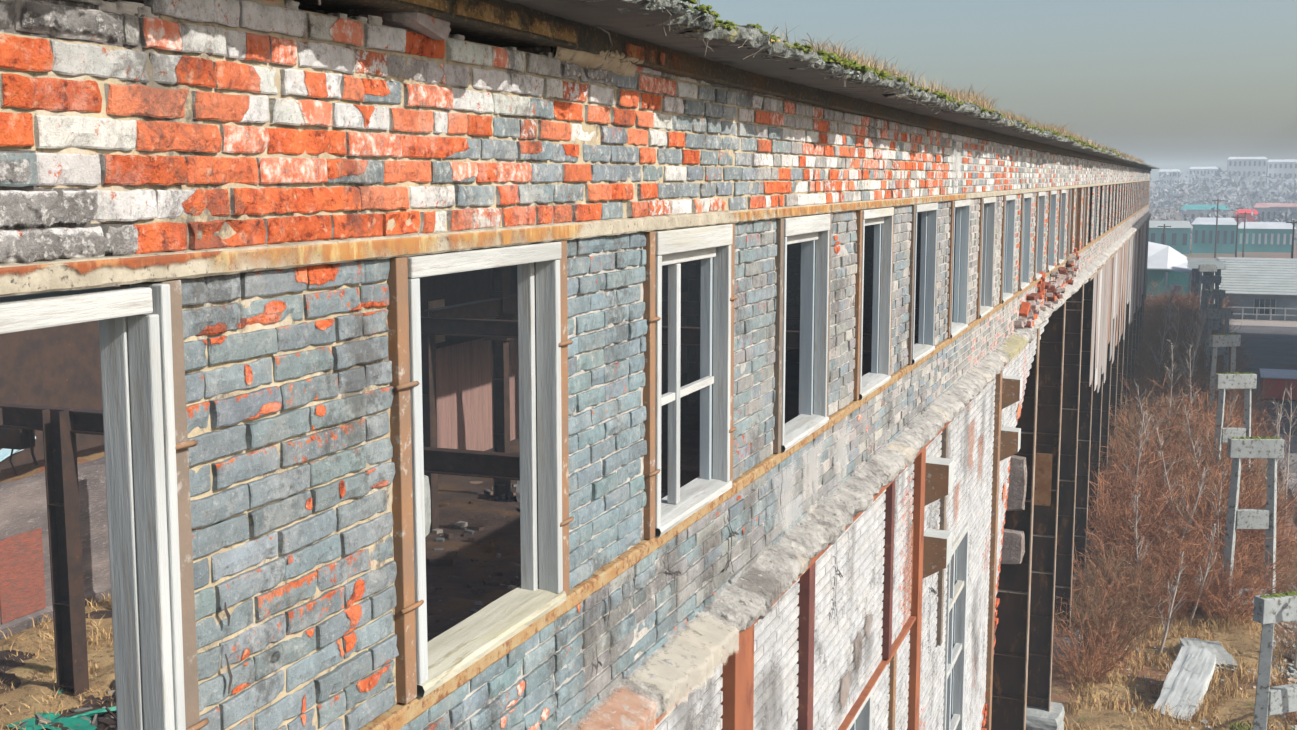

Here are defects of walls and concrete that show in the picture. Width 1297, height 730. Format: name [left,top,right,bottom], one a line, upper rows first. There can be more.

flaking render [0,0,700,263]
rust [0,224,581,274]
flaking render [197,301,286,345]
flaking render [296,264,338,285]
flaking render [315,319,333,330]
flaking render [350,301,387,316]
spalling [1014,248,1080,343]
flaking render [245,364,253,385]
flaking render [246,402,281,420]
flaking render [337,579,365,657]
flaking render [357,660,391,692]
spalling [580,616,739,730]